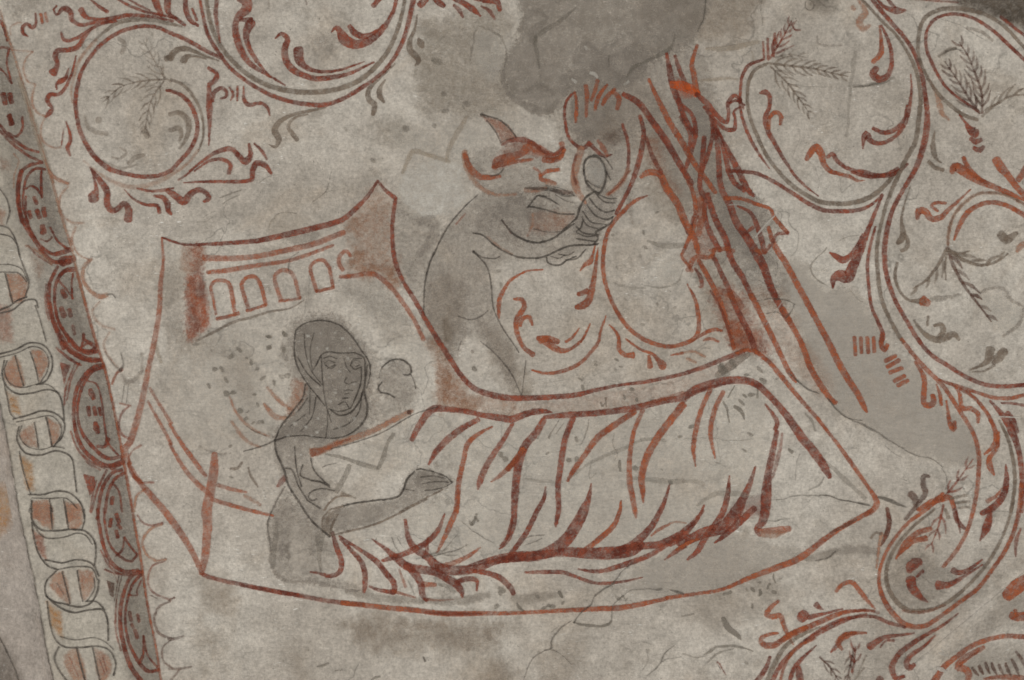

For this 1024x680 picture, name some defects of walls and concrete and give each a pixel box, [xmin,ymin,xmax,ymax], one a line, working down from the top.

damp [501,0,707,115]